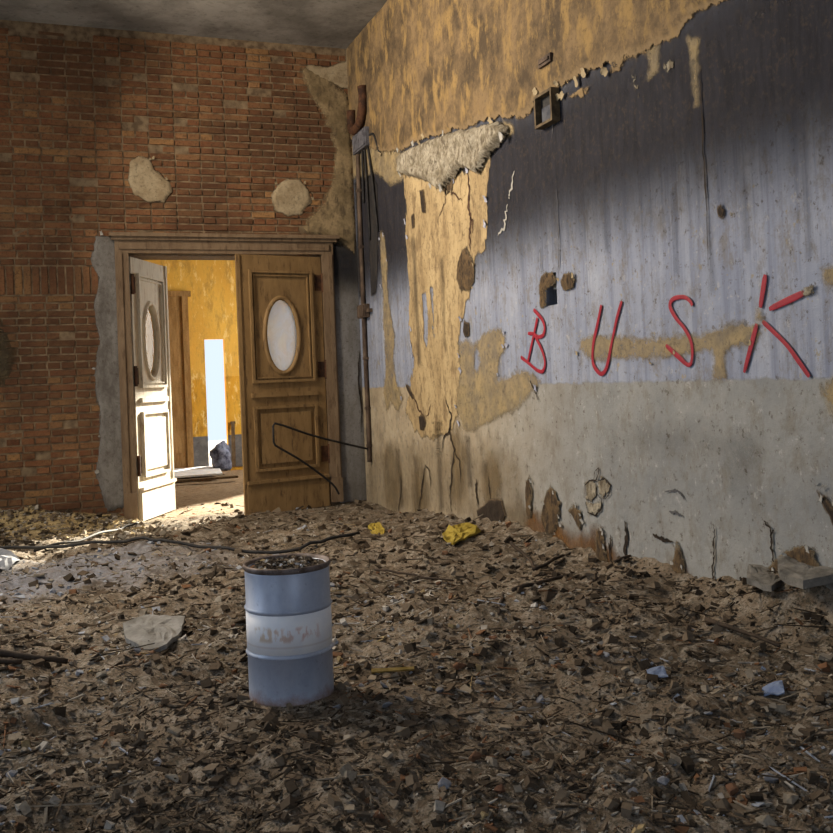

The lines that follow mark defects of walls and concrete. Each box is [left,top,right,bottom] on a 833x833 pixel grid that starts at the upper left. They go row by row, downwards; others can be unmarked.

flaking render [347,0,724,441]
peeling [575,308,762,380]
flaking render [525,467,611,536]
rust [526,514,616,562]
flaking render [816,483,833,525]